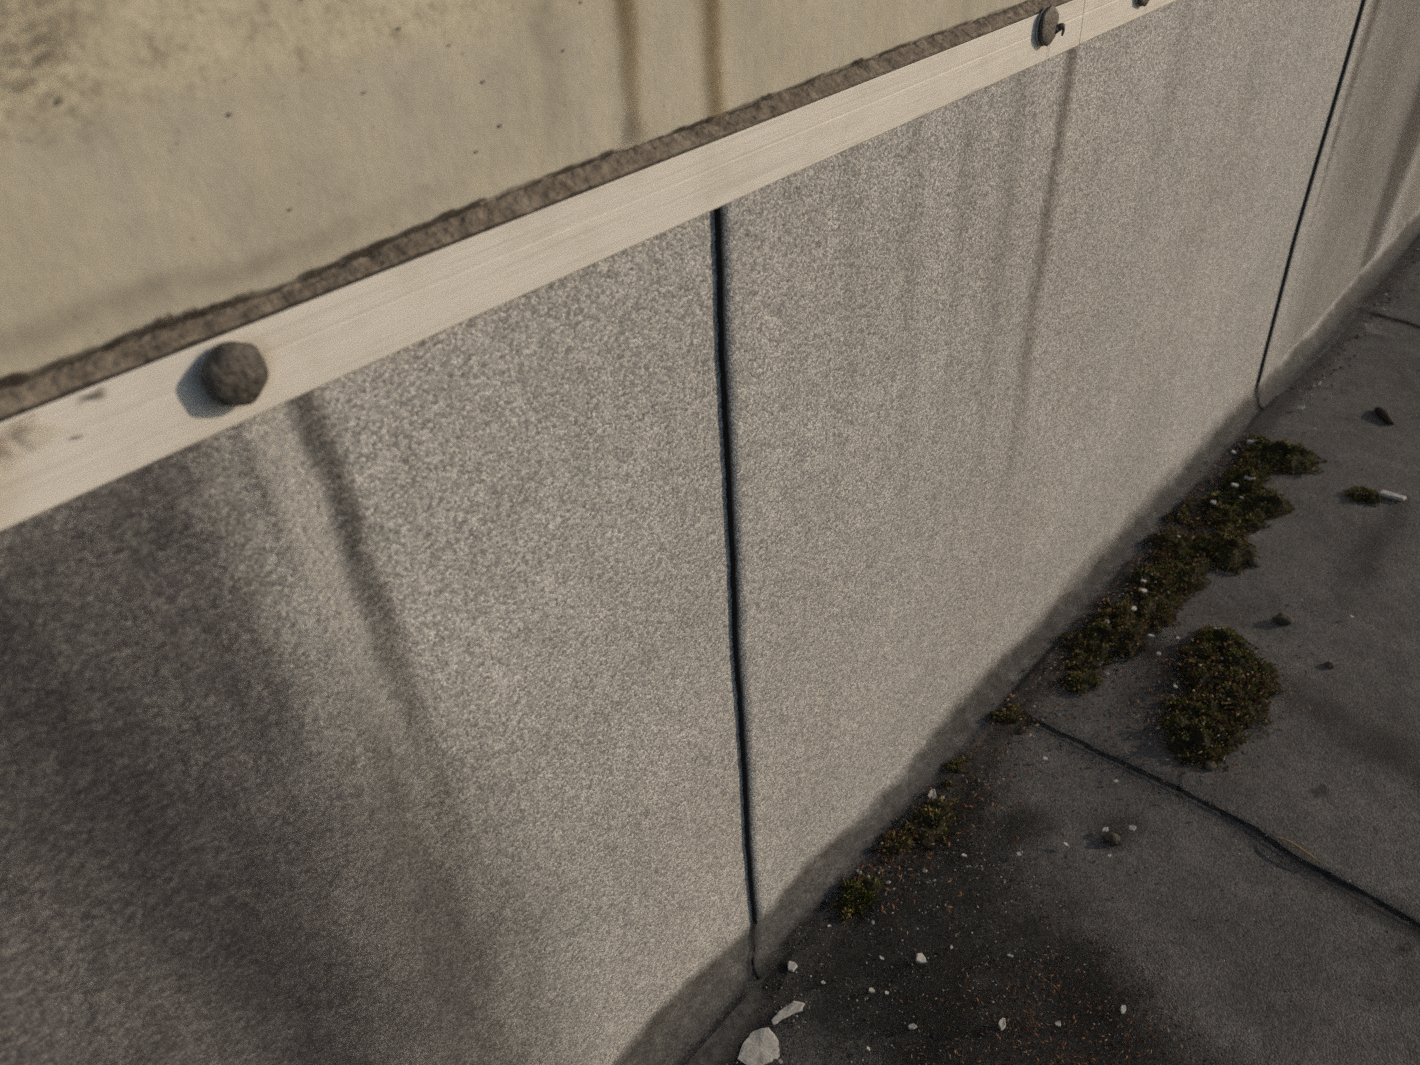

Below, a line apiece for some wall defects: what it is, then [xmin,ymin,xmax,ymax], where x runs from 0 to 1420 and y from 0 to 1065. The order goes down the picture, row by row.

damp [0,457,367,1065]
damp [259,394,381,712]